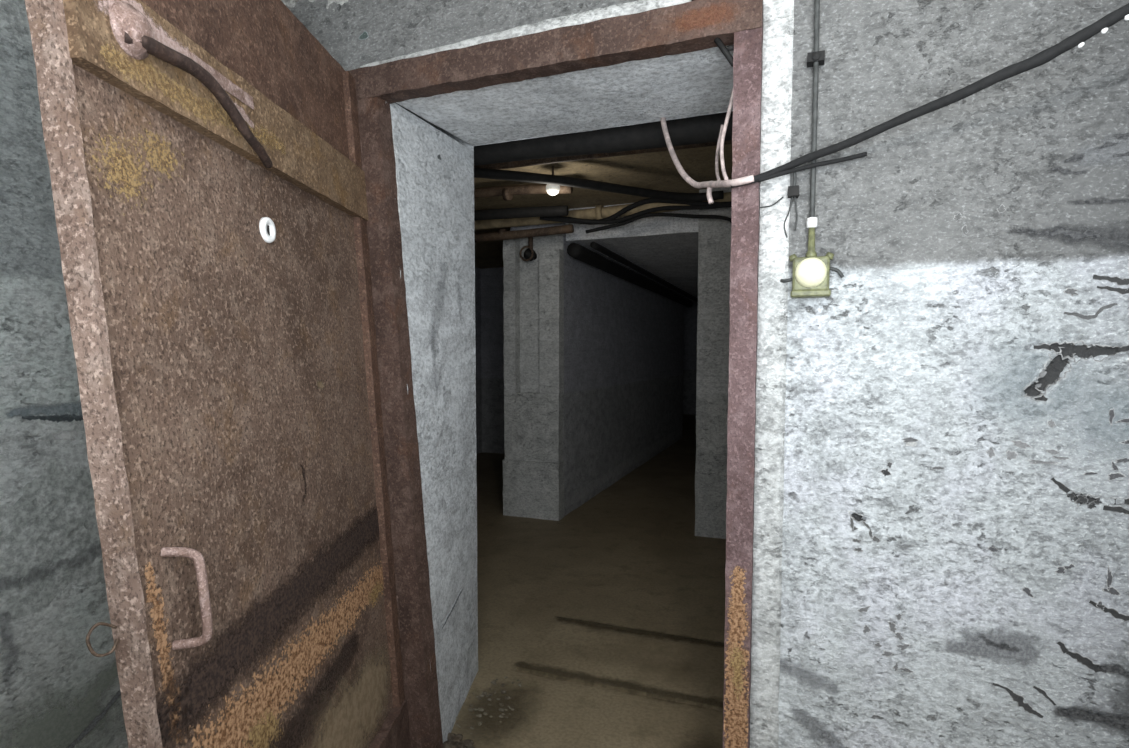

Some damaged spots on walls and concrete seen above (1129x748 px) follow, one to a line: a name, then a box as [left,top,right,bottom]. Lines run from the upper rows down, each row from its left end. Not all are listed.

flaking render [281,0,348,10]
rust [724,566,750,748]